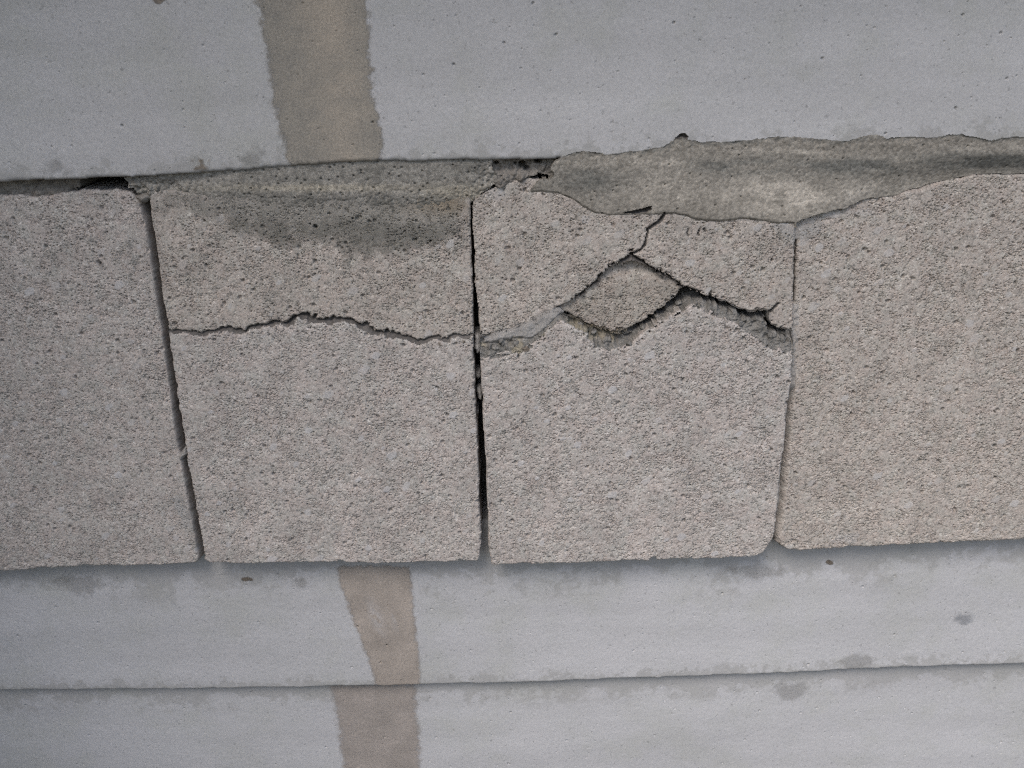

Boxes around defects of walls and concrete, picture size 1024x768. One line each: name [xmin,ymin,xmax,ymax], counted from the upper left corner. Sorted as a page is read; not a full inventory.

damp [181,195,467,254]
peeling [624,206,652,214]
crack [558,212,686,306]
crack [169,312,474,345]
spalling [479,286,794,361]